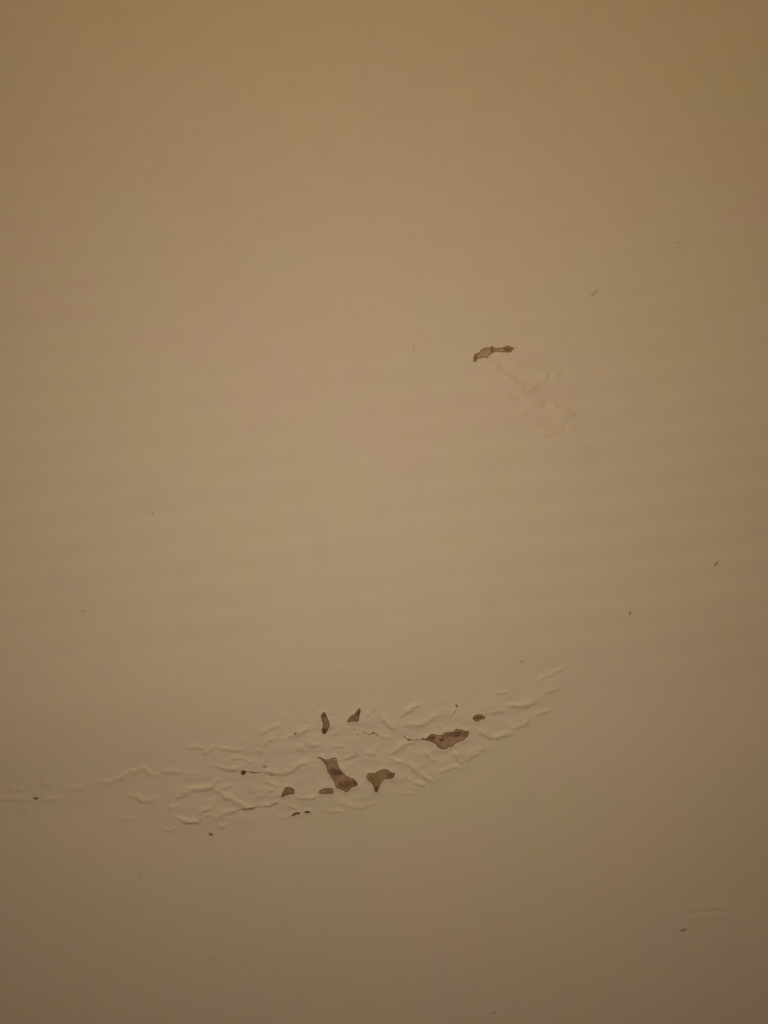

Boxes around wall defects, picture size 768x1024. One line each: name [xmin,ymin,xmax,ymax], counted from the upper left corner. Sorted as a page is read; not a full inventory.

peeling [469,342,518,366]
peeling [317,705,364,738]
peeling [416,711,489,754]
peeling [312,752,399,797]